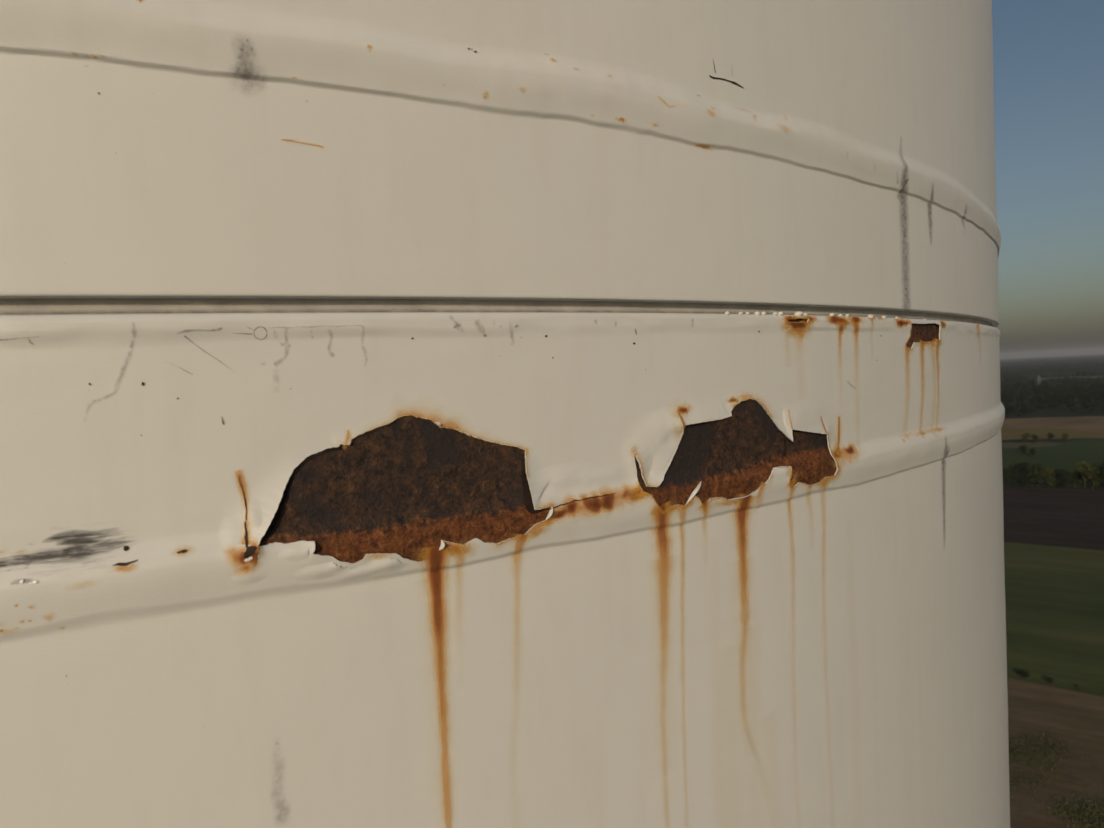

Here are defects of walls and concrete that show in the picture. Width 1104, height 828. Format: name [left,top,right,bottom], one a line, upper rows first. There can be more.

corrosion [785,316,816,337]
corrosion [829,316,882,339]
peeling [906,323,939,348]
corrosion [905,321,946,375]
corrosion [399,413,456,429]
peeling [634,399,837,508]
peeling [258,415,553,563]
corrosion [425,542,469,827]